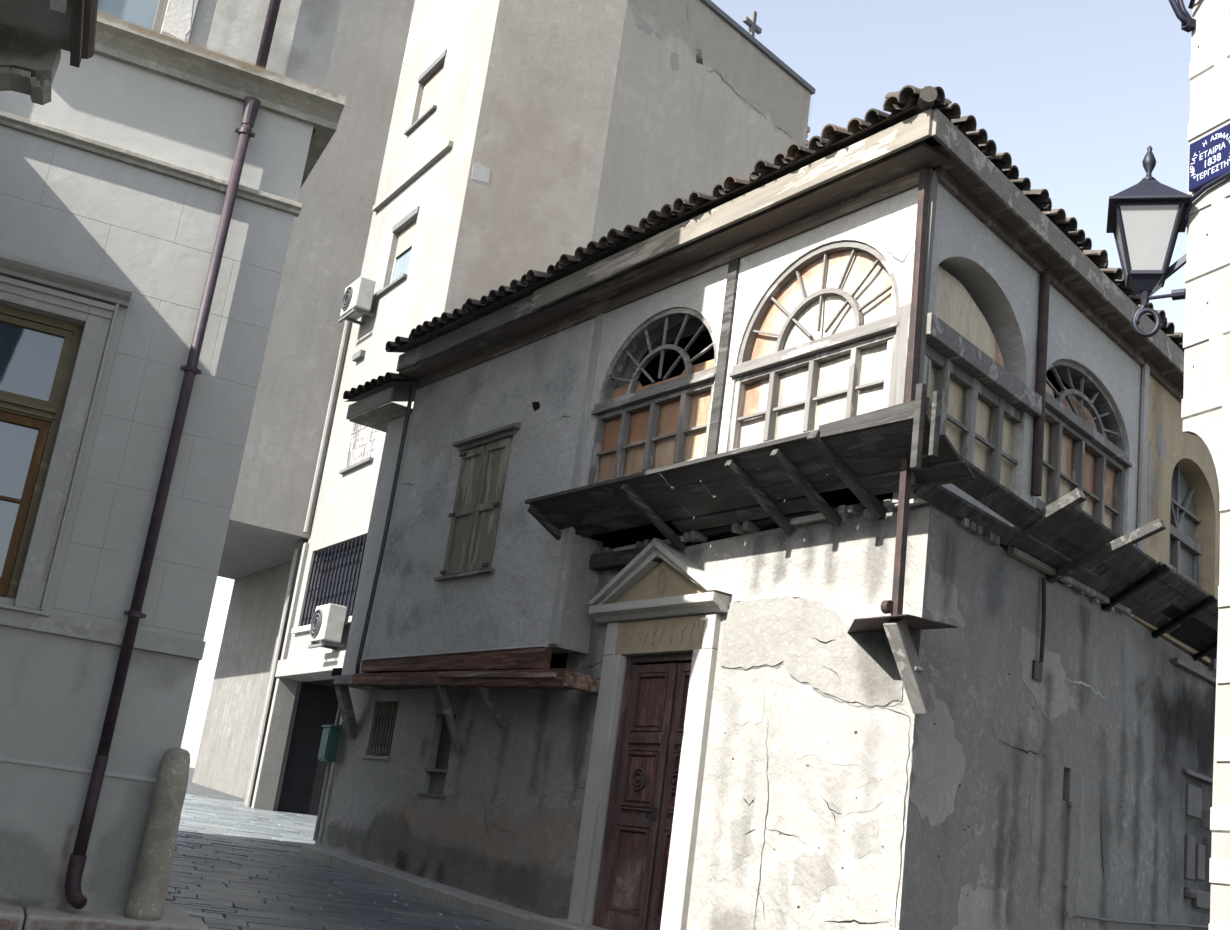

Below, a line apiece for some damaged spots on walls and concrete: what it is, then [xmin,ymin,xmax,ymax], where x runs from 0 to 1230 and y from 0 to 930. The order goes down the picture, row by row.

crack [744,729,806,930]